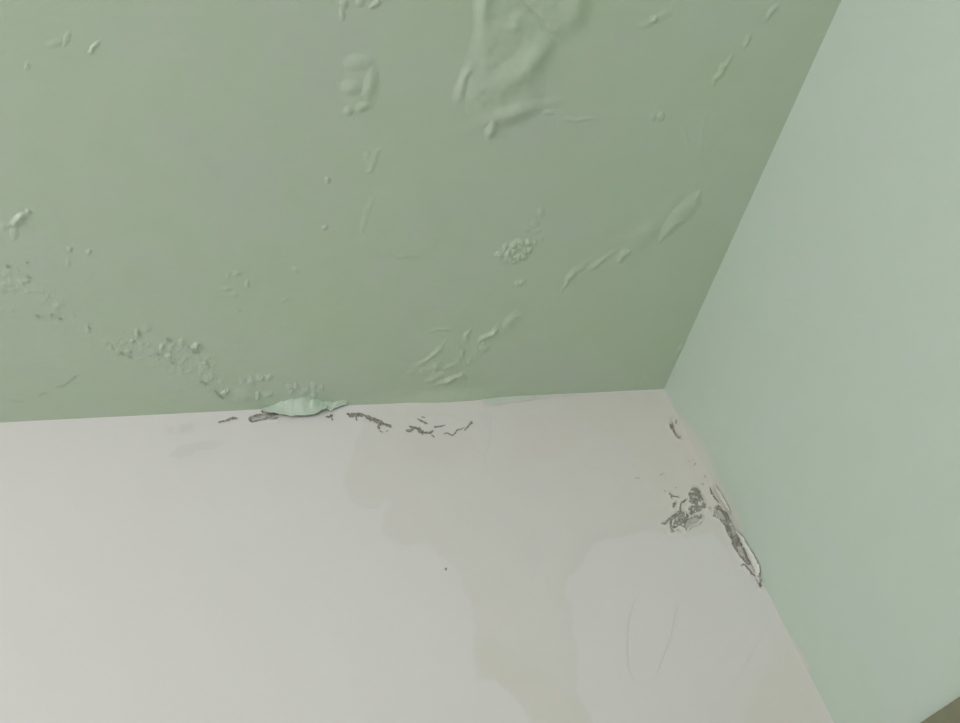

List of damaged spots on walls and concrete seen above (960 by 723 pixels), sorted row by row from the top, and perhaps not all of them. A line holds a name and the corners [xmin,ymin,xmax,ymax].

peeling [245,397,347,426]
spalling [658,475,765,593]